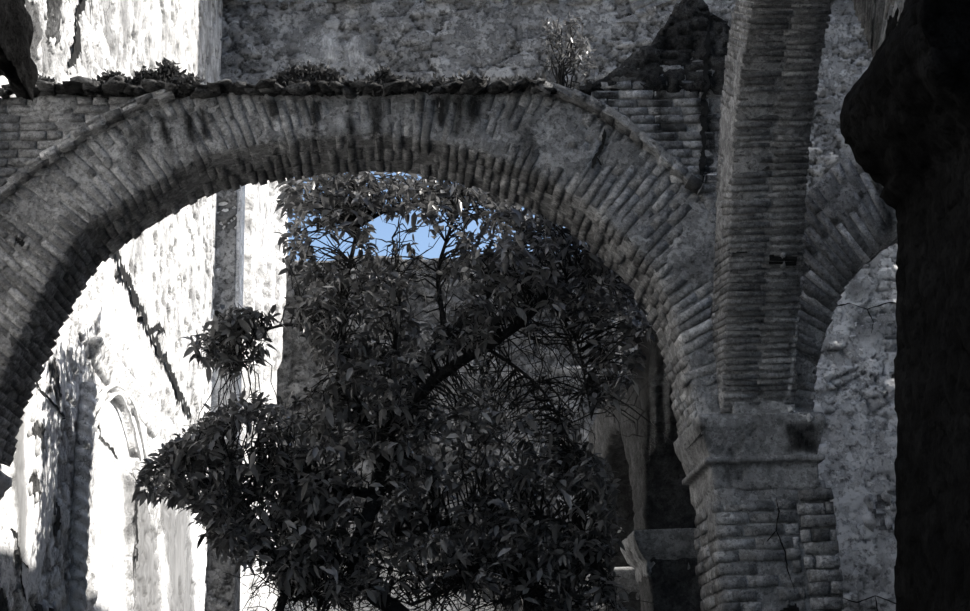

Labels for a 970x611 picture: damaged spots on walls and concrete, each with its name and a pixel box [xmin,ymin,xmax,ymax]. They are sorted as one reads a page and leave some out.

crack [69,0,93,75]
crack [114,250,192,426]
flaking render [27,411,47,504]
flaking render [53,489,63,543]
crack [767,496,795,591]
spalling [0,581,11,611]